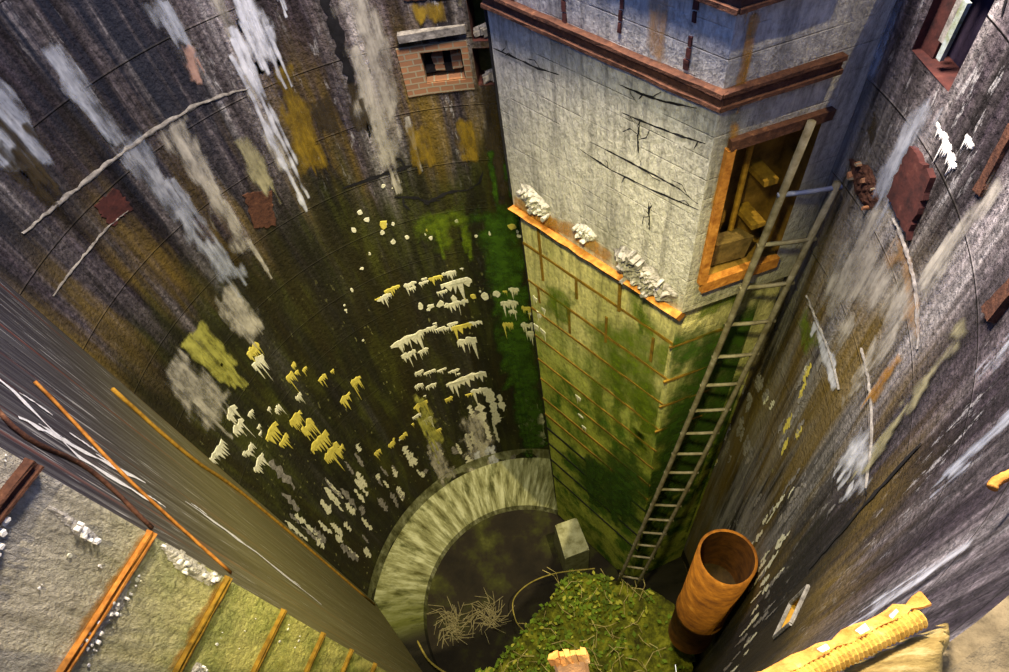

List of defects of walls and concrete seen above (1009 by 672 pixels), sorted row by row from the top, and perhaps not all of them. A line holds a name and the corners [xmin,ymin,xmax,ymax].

leakage [0,87,63,206]
leakage [229,0,341,211]
leakage [347,0,400,193]
crack [493,48,559,75]
crack [580,84,705,230]
corrosion [737,14,758,86]
leakage [415,395,455,487]
leakage [462,414,498,470]